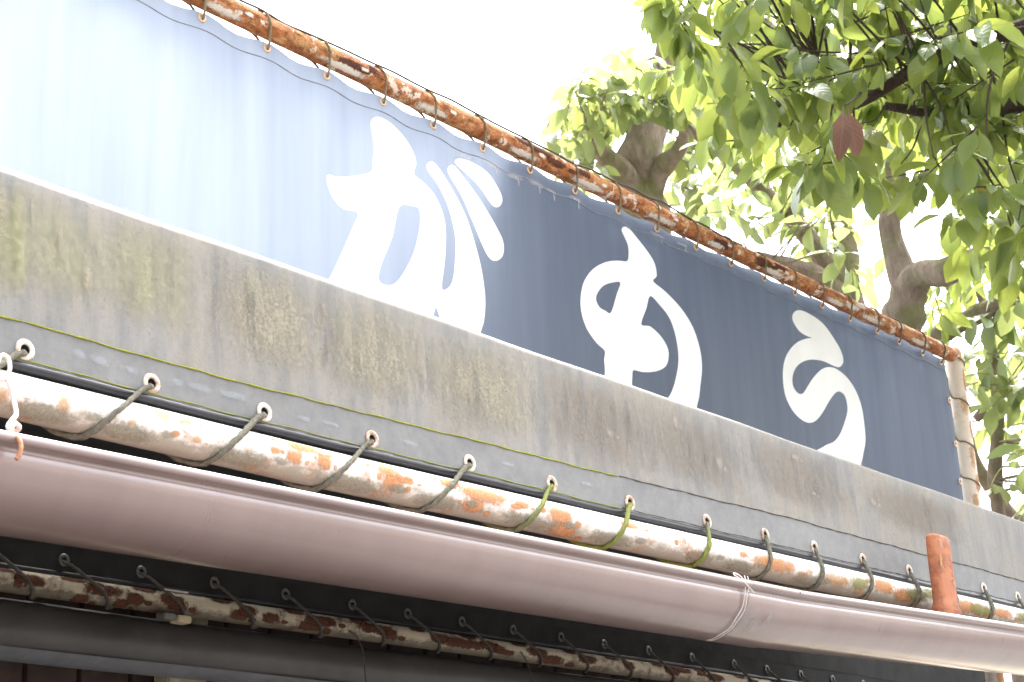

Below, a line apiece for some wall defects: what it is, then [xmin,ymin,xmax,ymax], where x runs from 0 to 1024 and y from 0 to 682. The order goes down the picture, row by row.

rust [145,408,207,445]
rust [270,438,337,470]
rust [366,463,421,493]
rust [433,477,583,541]
rust [0,567,45,588]
rust [60,576,196,613]
rust [740,551,915,604]
rust [958,600,1020,622]